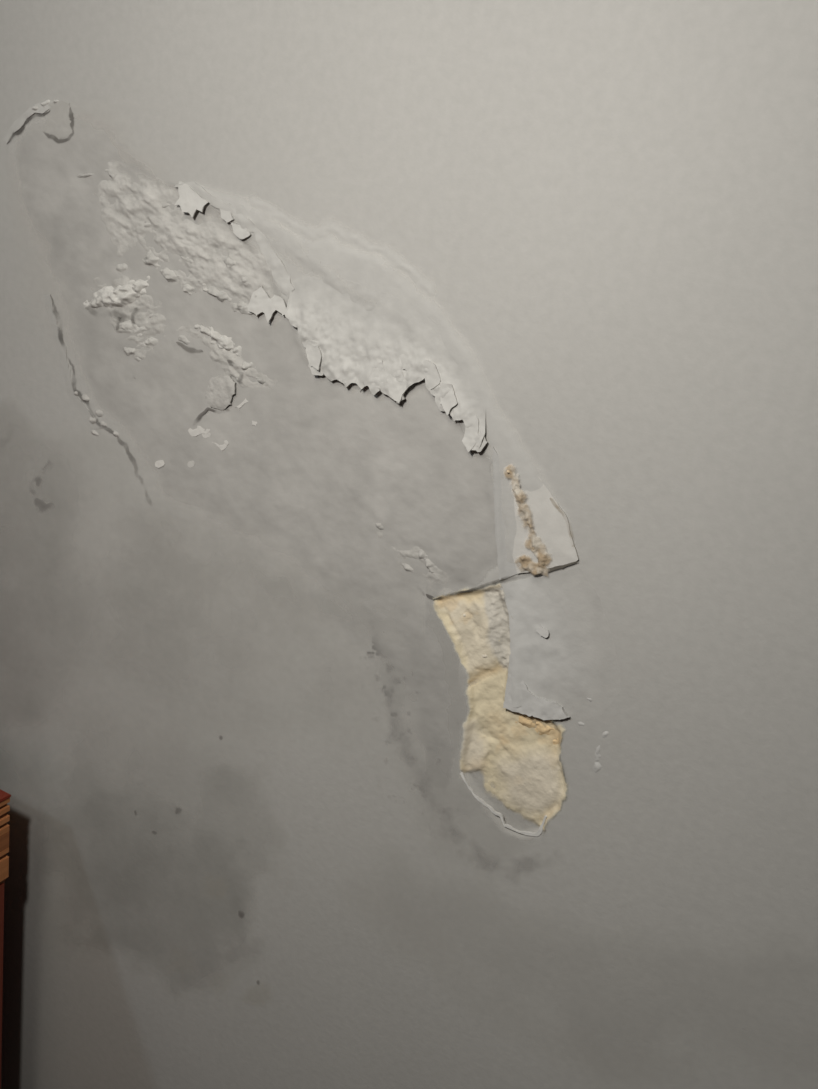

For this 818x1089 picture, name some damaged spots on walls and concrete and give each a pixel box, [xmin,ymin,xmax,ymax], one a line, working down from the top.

damp [0,458,86,731]
crack [41,294,119,437]
peeling [3,99,621,840]
damp [50,751,253,987]